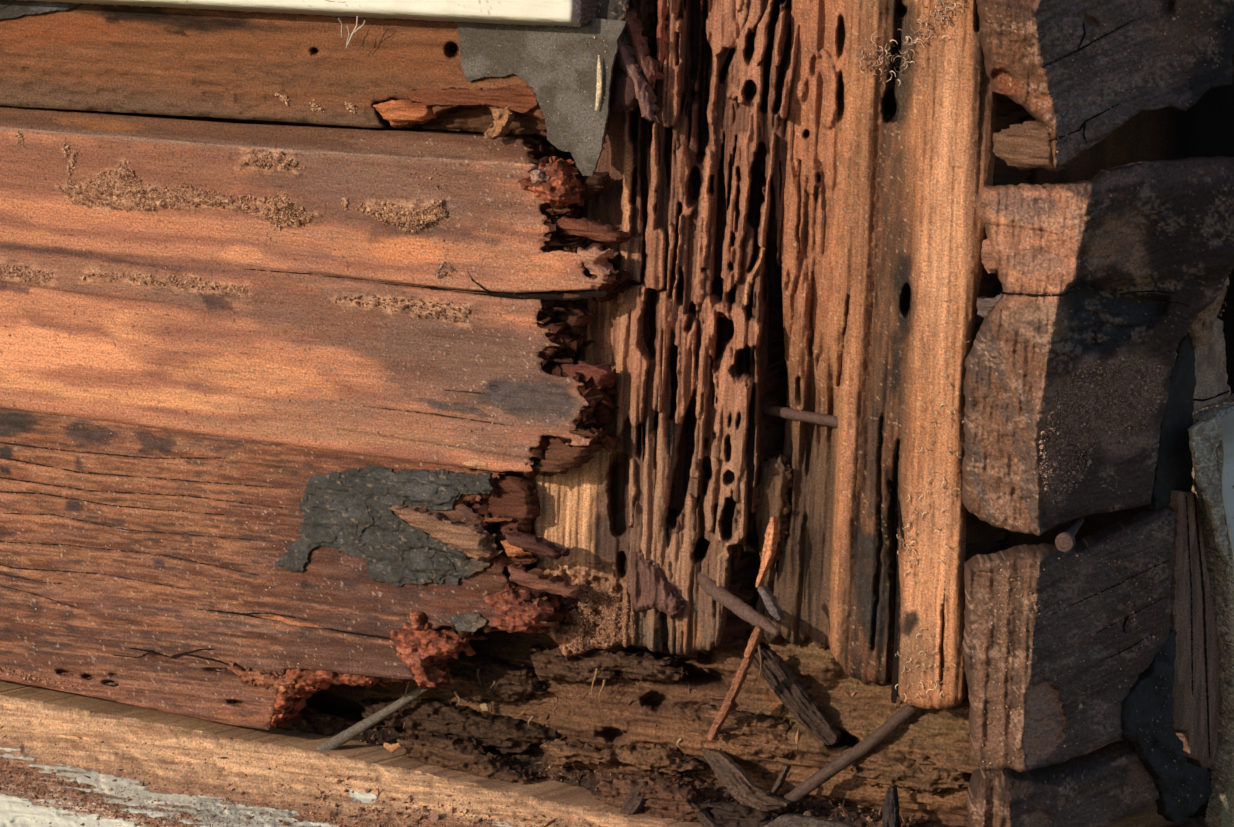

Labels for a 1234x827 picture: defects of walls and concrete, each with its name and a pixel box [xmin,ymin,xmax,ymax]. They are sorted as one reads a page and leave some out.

spalling [0,105,643,303]
crack [114,648,229,666]
spalling [0,292,704,827]
peeling [754,454,793,582]